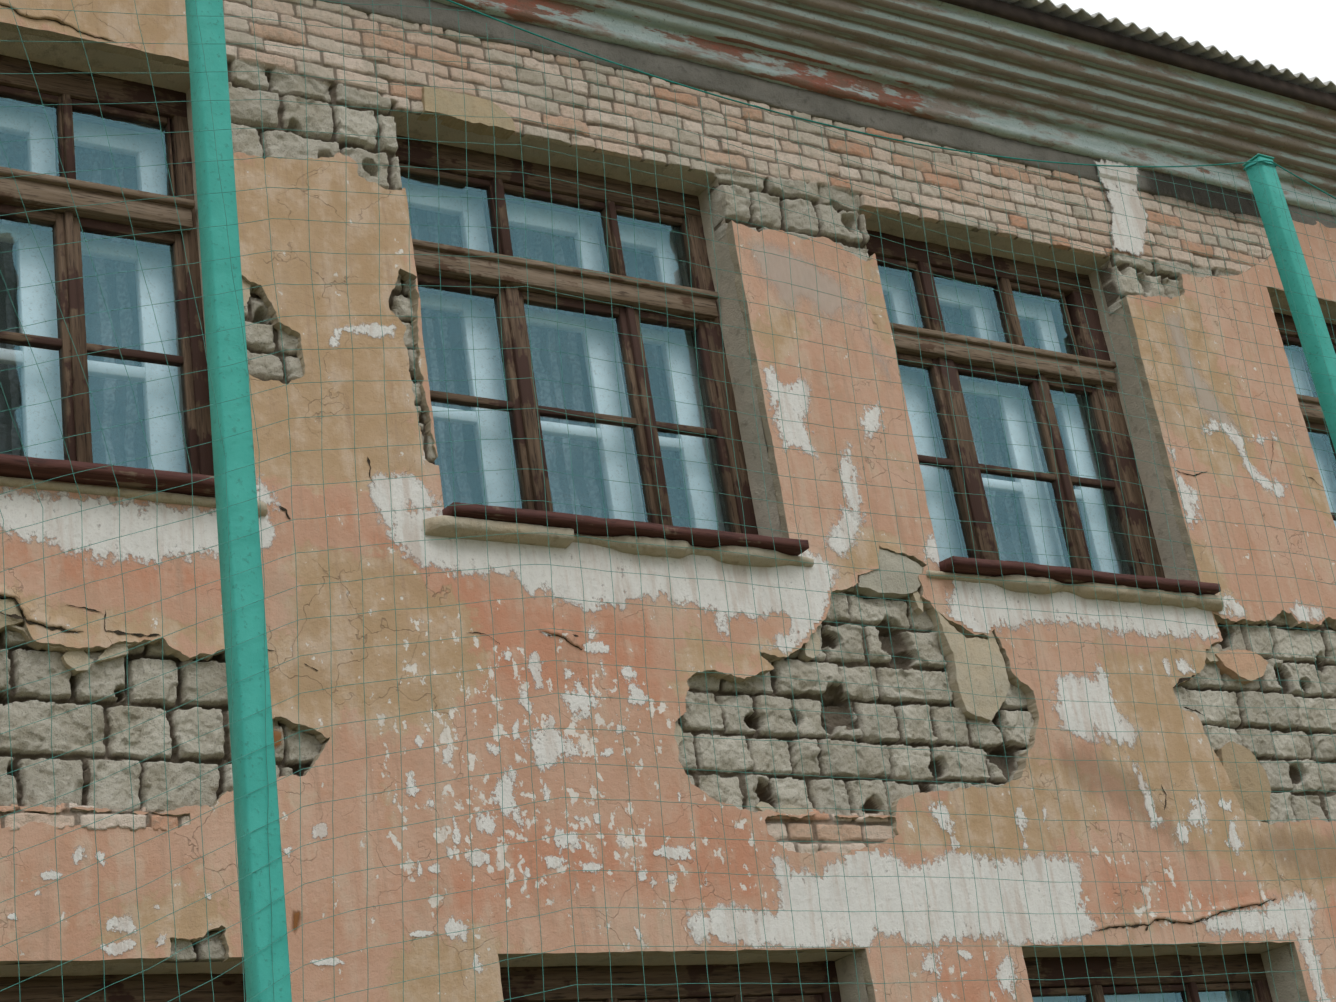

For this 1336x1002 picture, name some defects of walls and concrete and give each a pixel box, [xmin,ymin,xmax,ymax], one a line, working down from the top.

crack [0,0,117,42]
spalling [223,0,1272,315]
spalling [242,279,303,384]
spalling [329,274,436,464]
crack [0,584,159,637]
peeling [0,487,219,569]
spalling [0,625,233,831]
spalling [273,719,324,778]
spalling [368,401,1098,1002]
spalling [945,575,1336,825]
peeling [1049,663,1245,856]
crack [1091,890,1277,932]